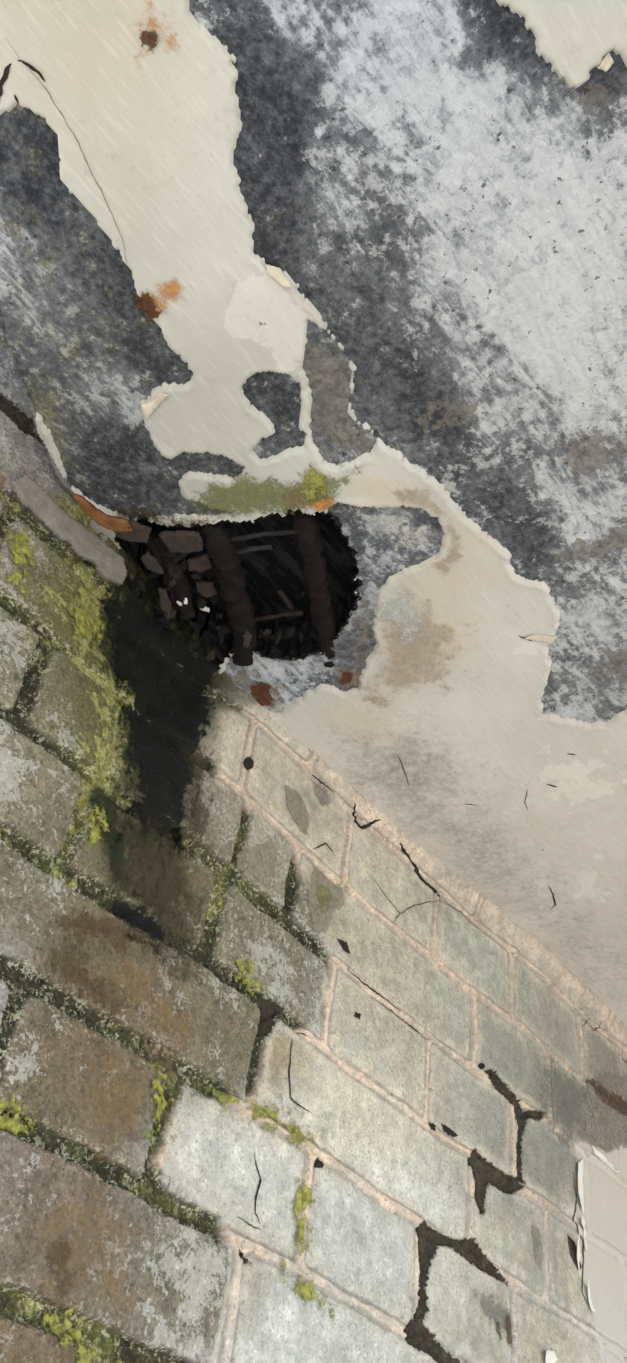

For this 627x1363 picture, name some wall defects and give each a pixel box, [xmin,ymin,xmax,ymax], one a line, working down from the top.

rust [140,17,174,51]
crack [0,40,131,271]
rust [134,281,180,323]
peeling [0,104,445,713]
peeling [189,0,627,724]
leakage [87,567,220,991]
crack [312,775,475,926]
peeling [541,1057,627,1313]
peeling [475,1294,515,1345]
peeling [545,1350,558,1363]